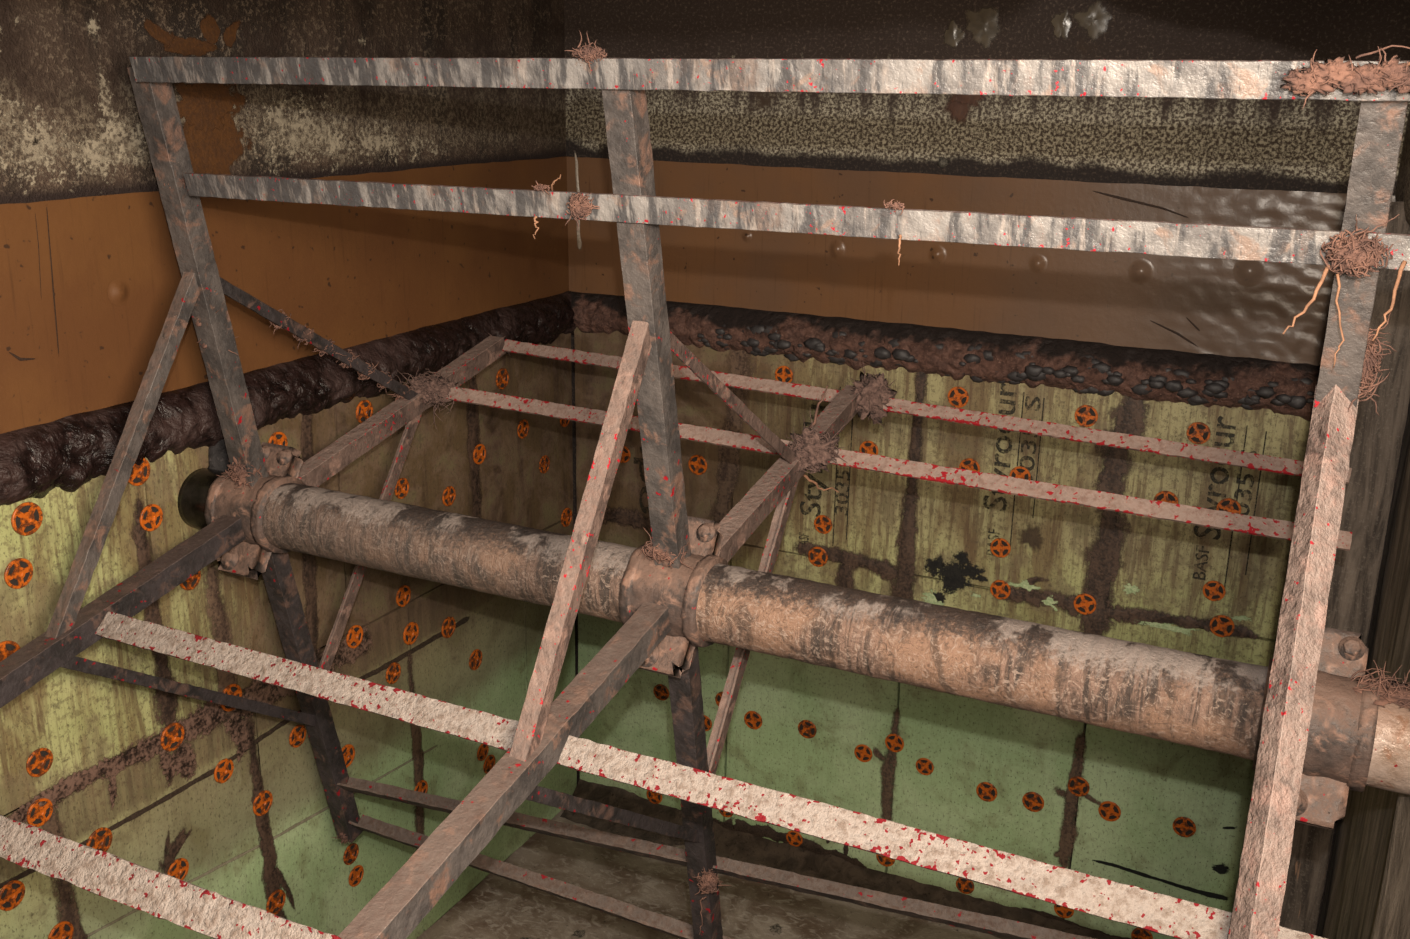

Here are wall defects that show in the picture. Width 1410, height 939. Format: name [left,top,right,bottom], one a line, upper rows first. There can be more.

damp [0,73,150,194]
peeling [921,589,945,605]
peeling [1008,580,1058,611]
peeling [1138,621,1199,636]